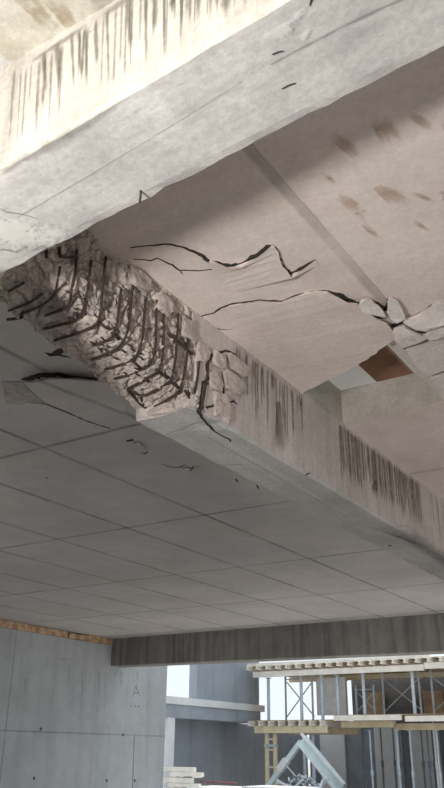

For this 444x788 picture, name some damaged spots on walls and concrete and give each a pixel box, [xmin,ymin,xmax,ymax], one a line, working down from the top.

water stain [71,23,97,75]
water stain [145,0,190,42]
spalling [0,211,249,424]
crack [130,243,444,442]
crack [2,348,127,429]
water stain [245,363,302,432]
water stain [339,426,422,520]